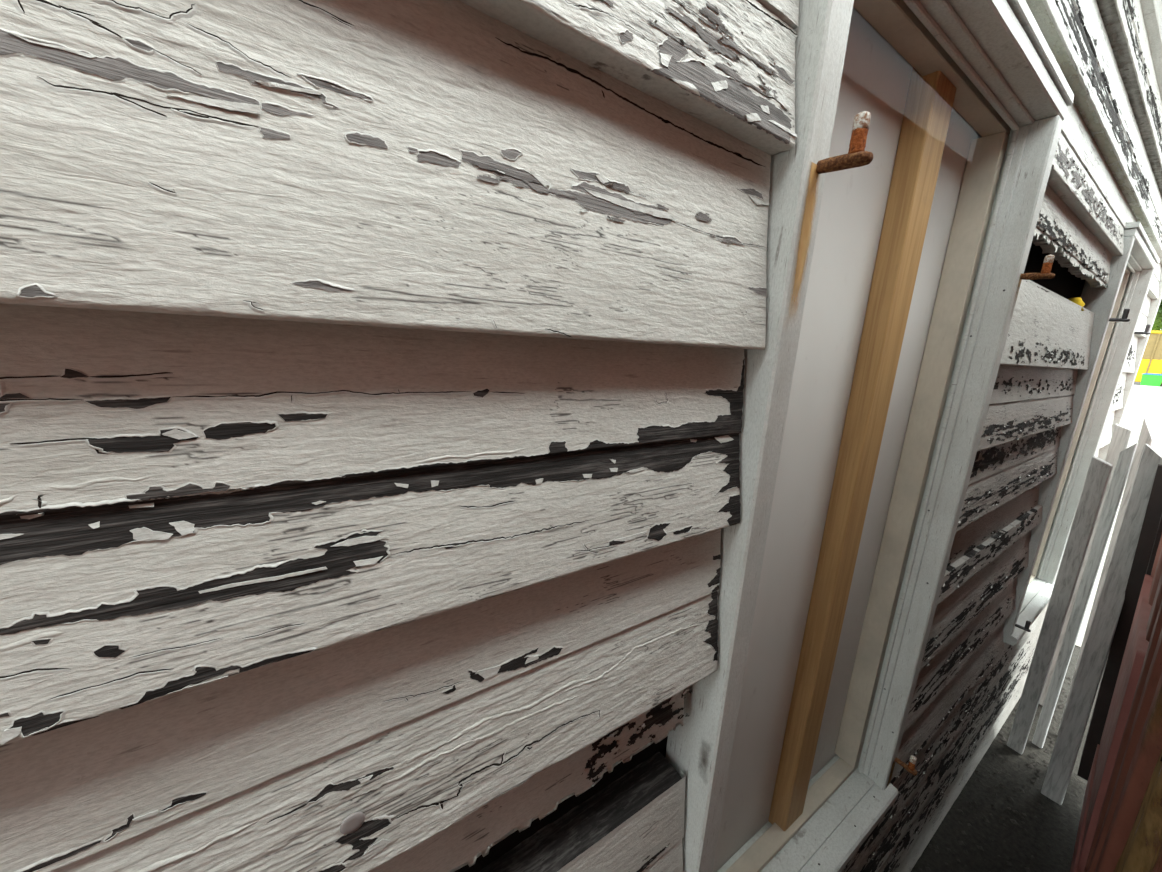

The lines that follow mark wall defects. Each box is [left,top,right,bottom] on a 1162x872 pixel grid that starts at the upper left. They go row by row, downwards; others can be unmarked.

peeling [0,28,375,141]
crack [495,37,766,169]
peeling [648,0,798,145]
peeling [1052,0,1162,248]
peeling [406,146,676,227]
peeling [0,357,745,567]
peeling [957,408,1072,527]
peeling [0,529,391,646]
peeling [703,554,721,661]
peeling [0,709,104,745]
peeling [118,647,319,709]
peeling [582,688,692,787]